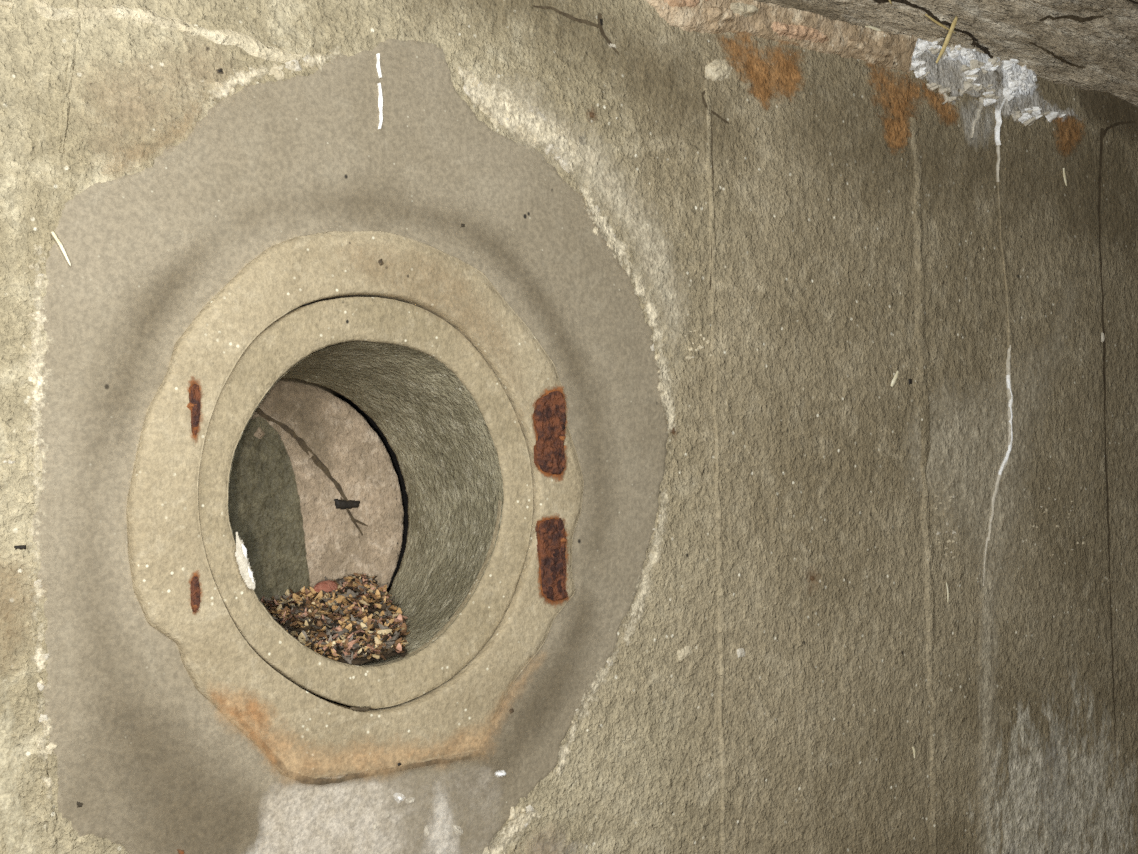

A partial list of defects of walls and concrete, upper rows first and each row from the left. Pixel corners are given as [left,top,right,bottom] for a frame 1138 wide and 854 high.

rust [723,34,800,107]
rust [869,64,958,148]
crack [874,0,993,58]
damp [911,38,1074,182]
crack [1029,15,1104,68]
rust [186,377,201,440]
rust [533,387,567,481]
rust [189,572,201,613]
rust [535,516,568,605]
damp [255,780,415,854]
damp [424,799,463,854]